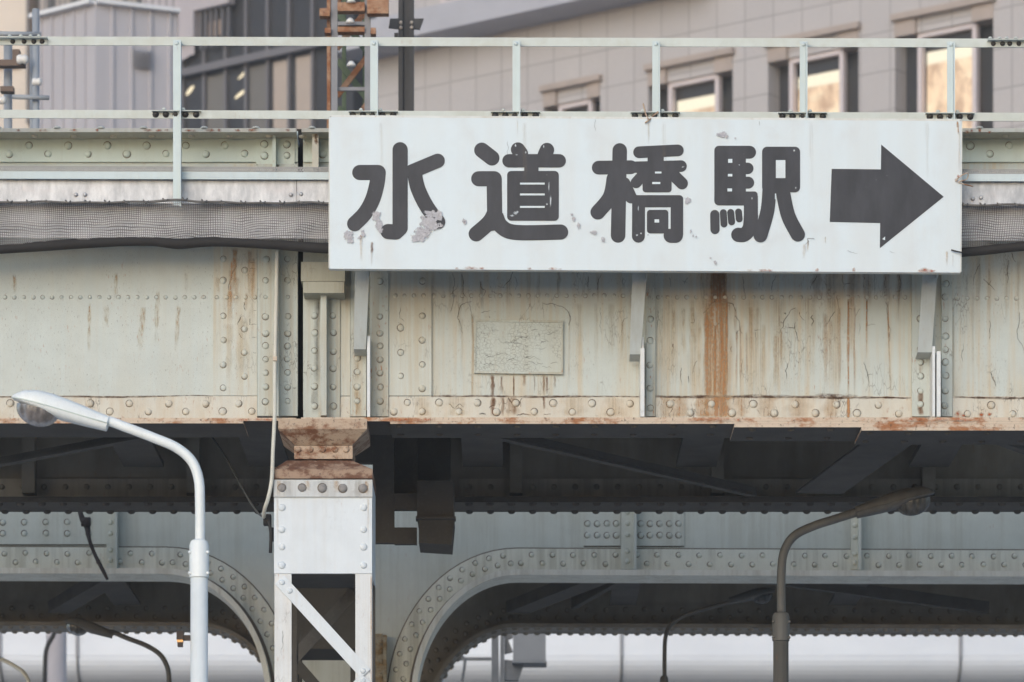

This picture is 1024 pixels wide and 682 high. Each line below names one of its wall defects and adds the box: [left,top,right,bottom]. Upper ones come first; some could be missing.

peeling [344,210,383,243]
peeling [411,210,443,242]
crack [451,272,571,368]
corrosion [657,273,905,421]
corrosion [435,374,639,413]